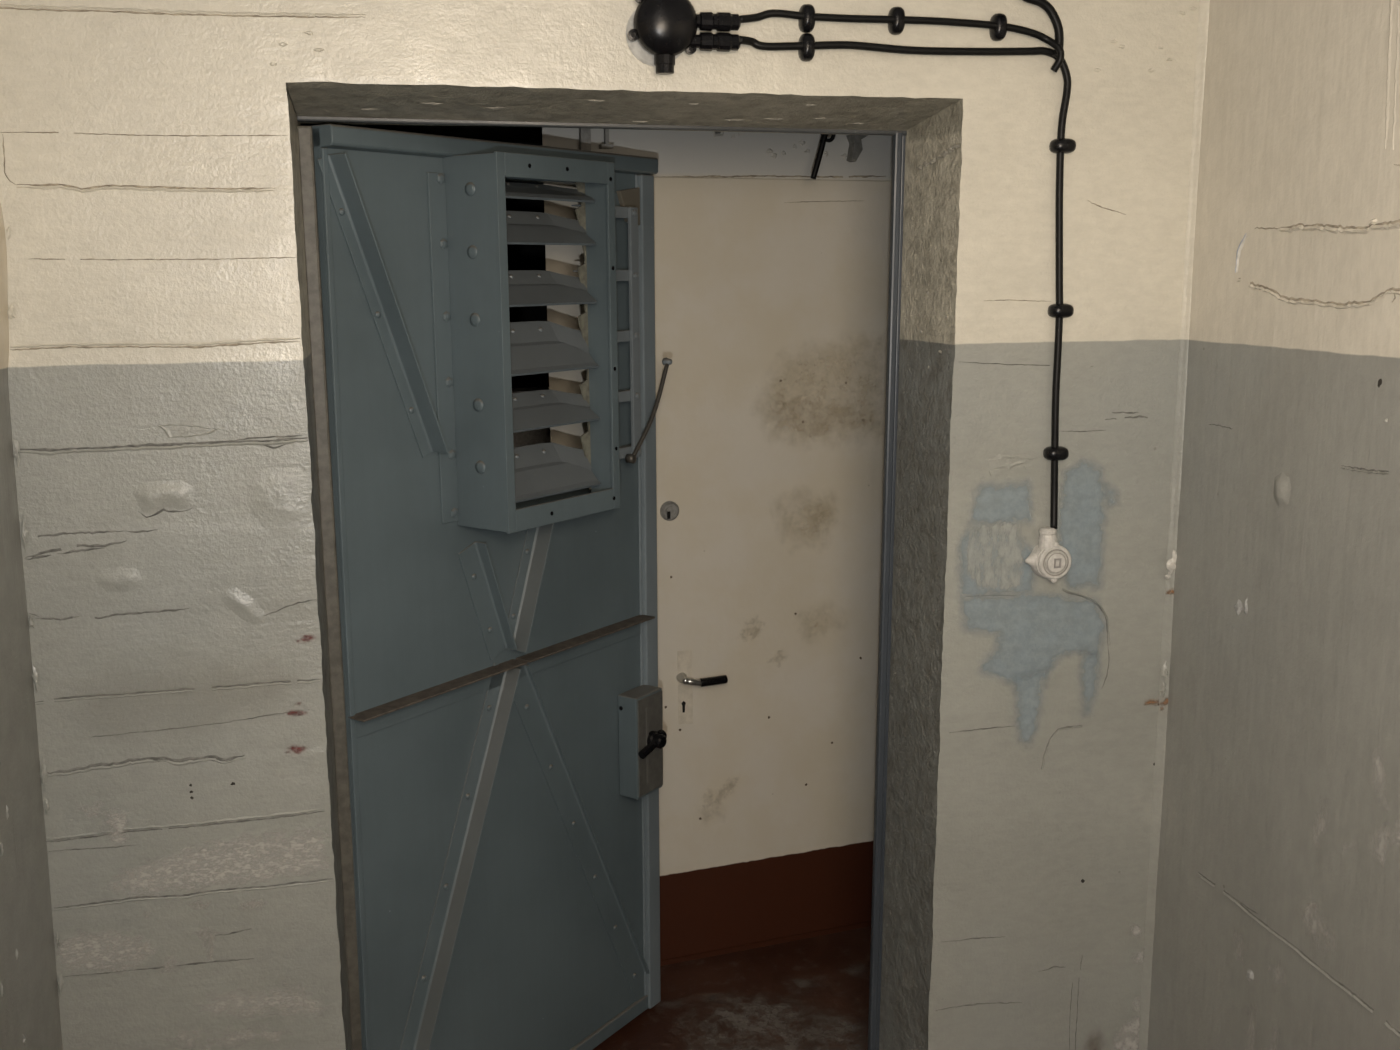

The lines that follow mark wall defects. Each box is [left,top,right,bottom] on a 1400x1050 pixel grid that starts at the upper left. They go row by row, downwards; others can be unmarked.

crack [1235,219,1400,309]
crack [1198,873,1400,1037]